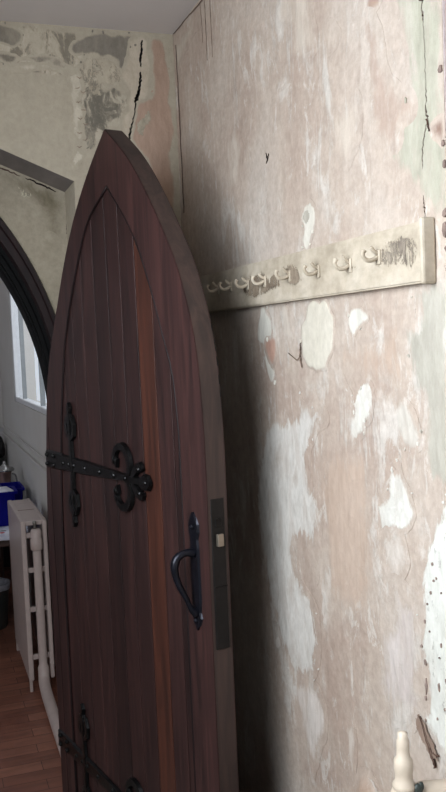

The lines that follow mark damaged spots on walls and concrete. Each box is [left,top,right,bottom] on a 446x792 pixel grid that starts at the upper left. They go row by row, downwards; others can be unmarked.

crack [0,168,56,192]
peeling [0,22,136,173]
crack [128,40,143,139]
flaking render [130,35,178,217]
crack [173,0,213,205]
peeling [299,198,317,250]
peeling [365,0,446,251]
peeling [254,265,446,766]